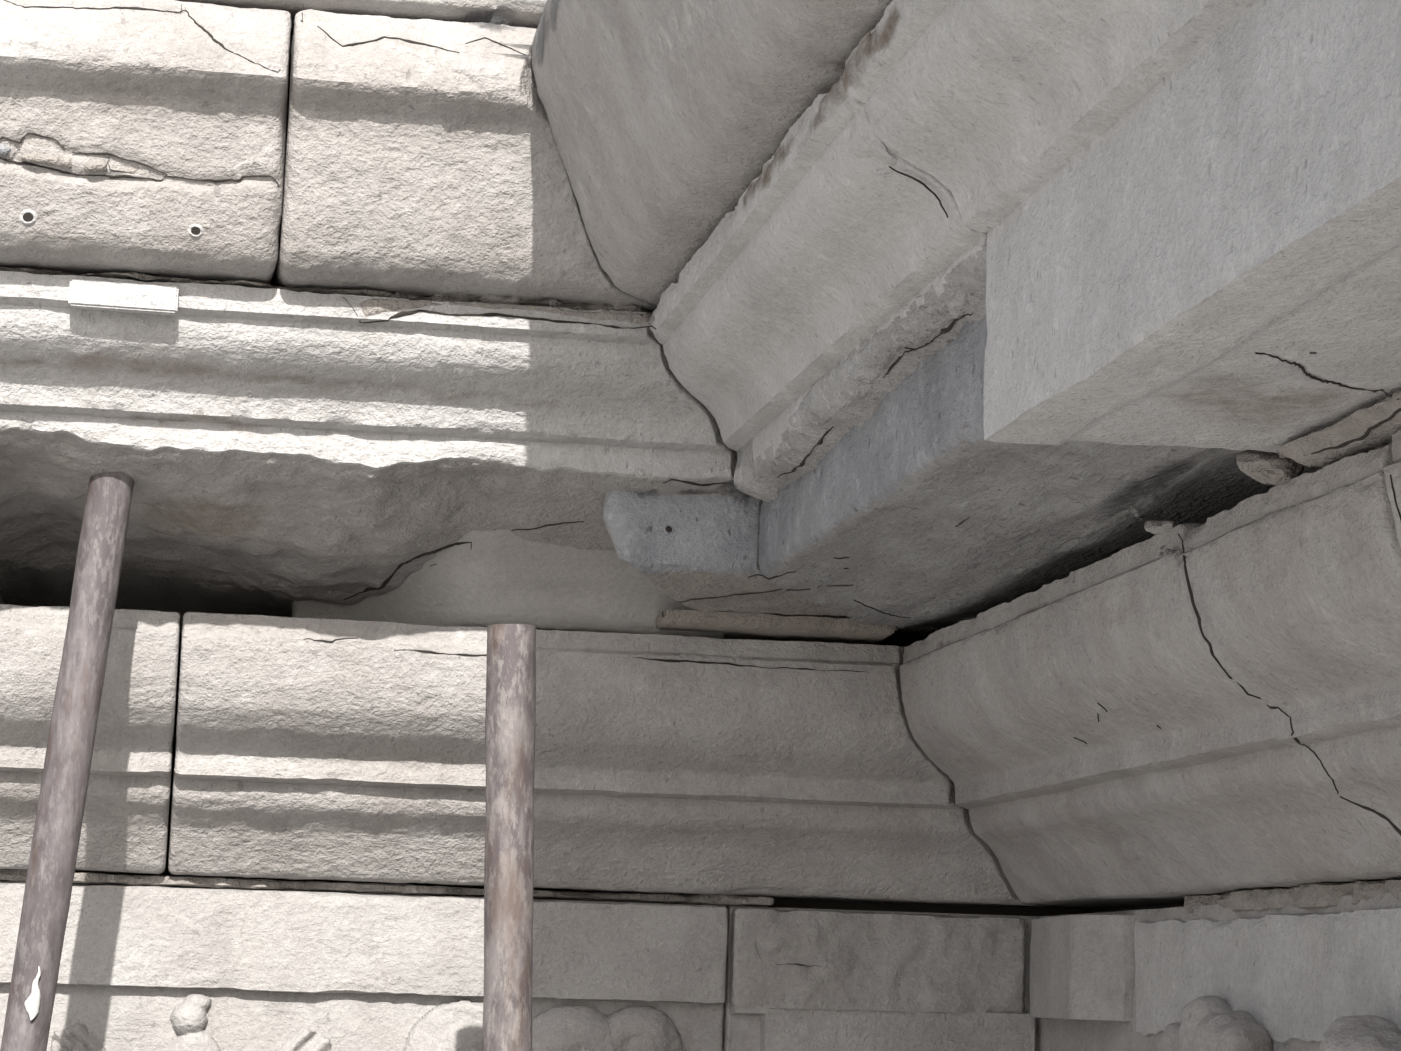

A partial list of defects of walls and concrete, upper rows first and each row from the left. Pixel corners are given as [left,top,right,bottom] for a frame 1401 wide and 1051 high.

crack [4,0,281,72]
crack [291,4,526,55]
crack [0,132,279,187]
crack [889,166,948,218]
crack [1255,352,1401,455]
crack [1390,475,1401,521]
crack [512,521,584,531]
crack [344,542,472,600]
crack [306,636,358,644]
crack [402,648,487,656]
crack [633,657,869,673]
crack [1178,534,1401,836]